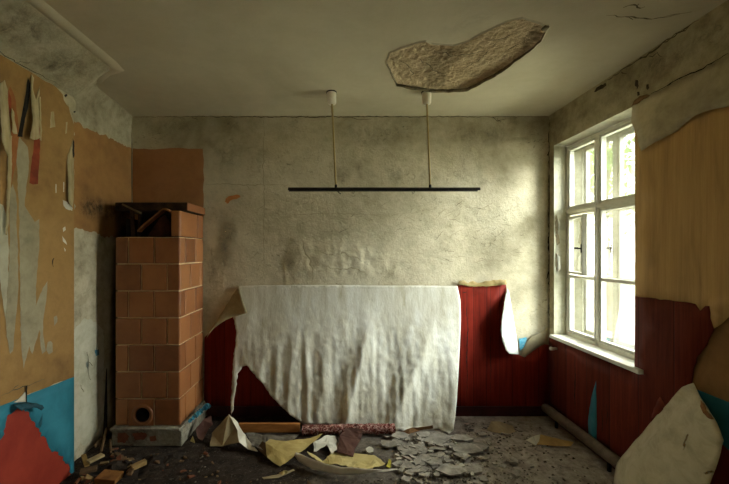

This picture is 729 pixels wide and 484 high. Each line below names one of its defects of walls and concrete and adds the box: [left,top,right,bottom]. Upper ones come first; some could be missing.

crack [608,4,698,80]
peeling [631,56,729,151]
crack [651,53,728,94]
peeling [0,74,55,367]
peeling [13,386,44,428]